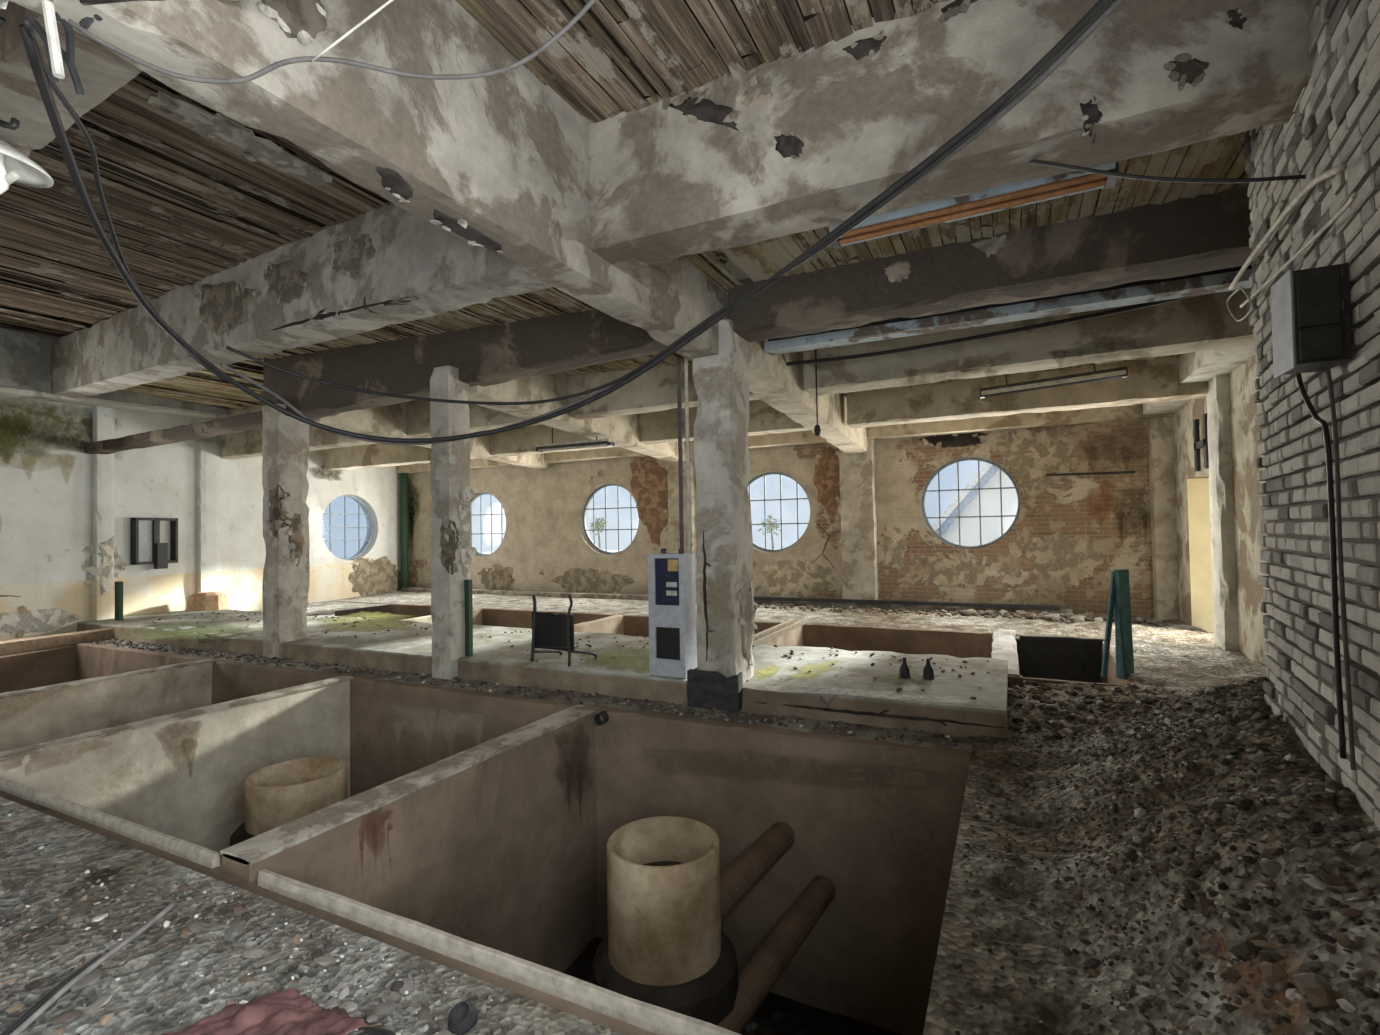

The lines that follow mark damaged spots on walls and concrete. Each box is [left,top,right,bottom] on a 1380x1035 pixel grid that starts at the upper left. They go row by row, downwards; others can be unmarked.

spalling [257,0,327,45]
spalling [1164,53,1210,91]
spalling [1080,92,1103,144]
water stain [0,399,93,475]
spalling [630,456,669,550]
spalling [813,447,841,524]
peeling [919,426,1074,513]
peeling [82,536,126,598]
peeling [1024,531,1104,588]
peeling [0,606,84,637]